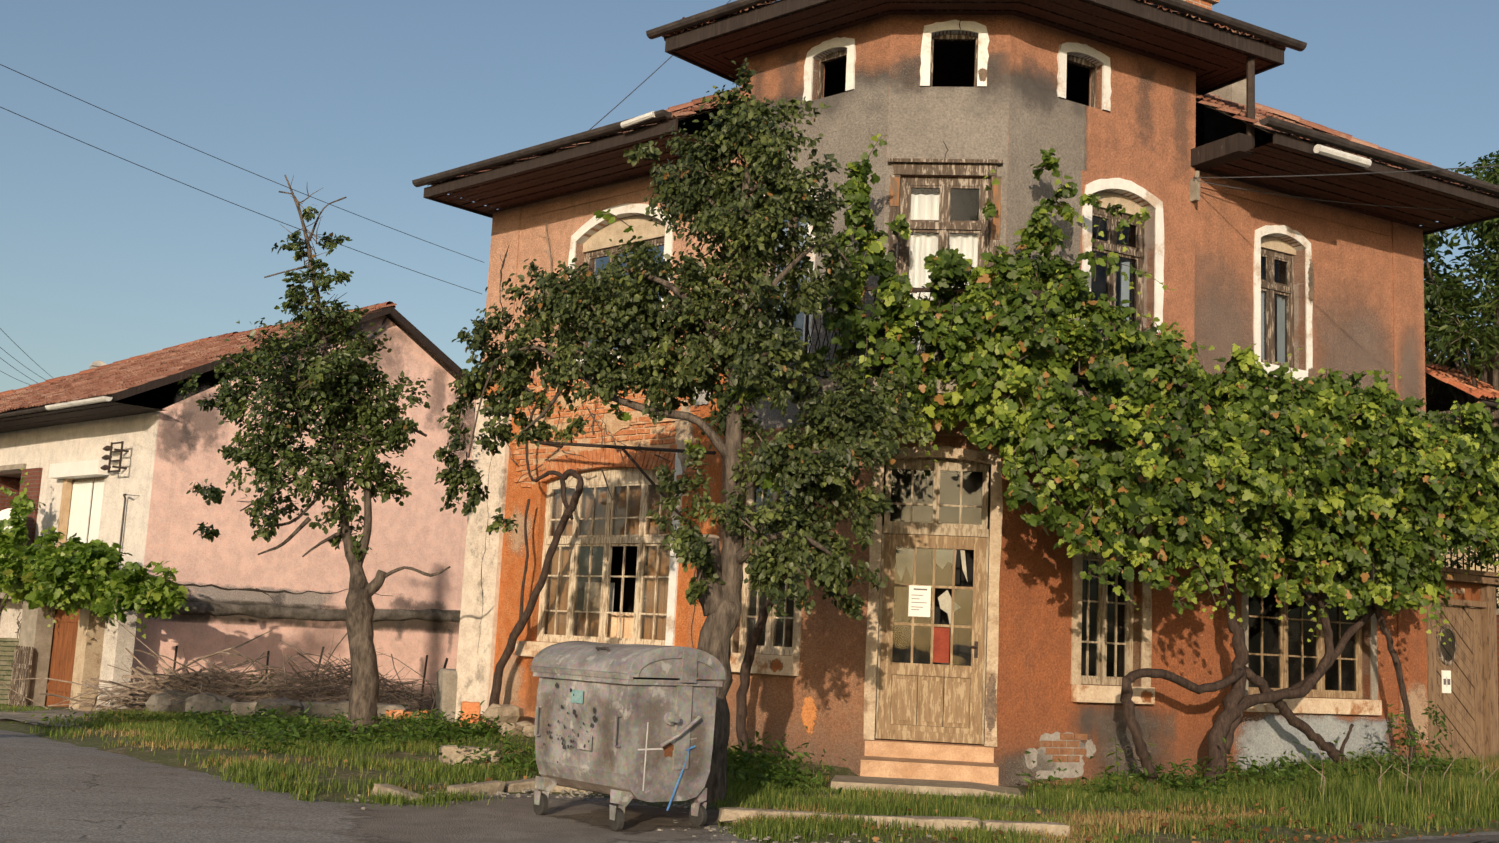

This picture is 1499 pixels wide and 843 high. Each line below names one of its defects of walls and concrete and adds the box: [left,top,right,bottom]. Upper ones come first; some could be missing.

flaking render [511,365,711,487]
flaking render [1024,731,1096,779]